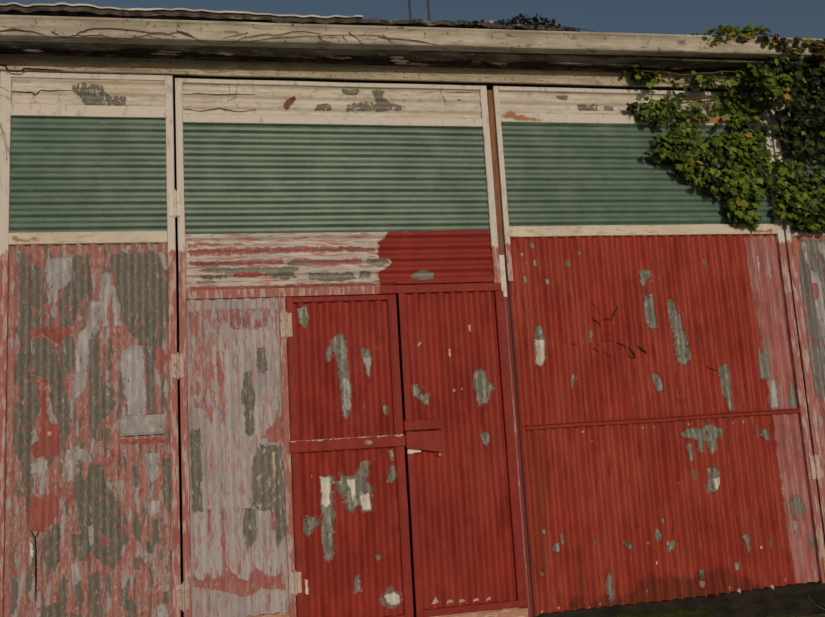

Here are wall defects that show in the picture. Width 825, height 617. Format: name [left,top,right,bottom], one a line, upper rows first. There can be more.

peeling [72,82,127,106]
peeling [342,89,405,112]
corrosion [503,111,537,120]
peeling [240,347,268,436]
peeling [324,333,353,424]
peeling [533,315,547,376]
crack [573,299,647,358]
peeling [666,296,692,366]
peeling [16,251,171,617]
peeling [680,423,724,496]
peeling [243,434,403,563]
peeling [373,583,403,612]